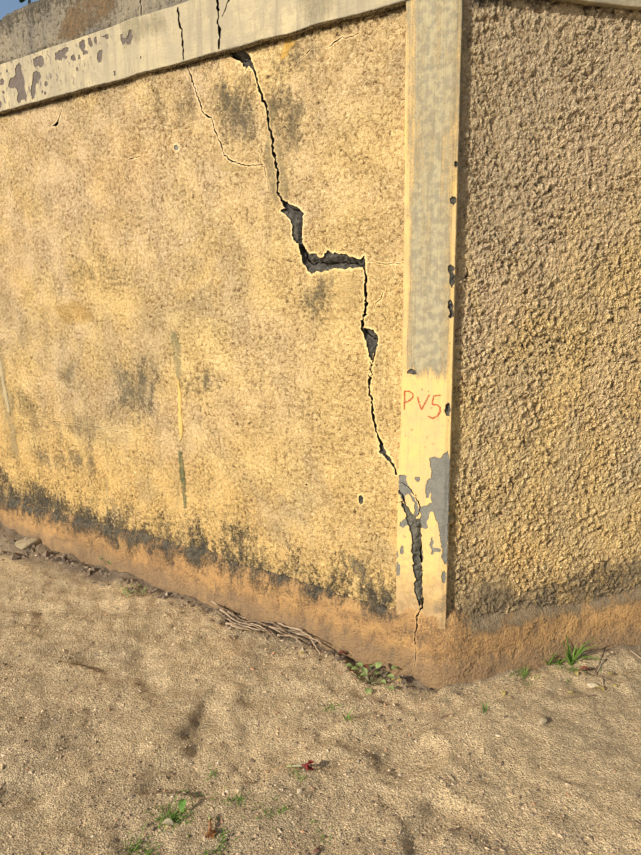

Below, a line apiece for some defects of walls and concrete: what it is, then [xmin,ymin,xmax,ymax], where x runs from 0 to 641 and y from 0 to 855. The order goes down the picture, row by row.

peeling [0,55,48,108]
peeling [55,34,109,71]
peeling [120,30,133,45]
crack [177,0,303,213]
leakage [0,465,397,621]
crack [299,243,424,666]
peeling [396,451,451,607]